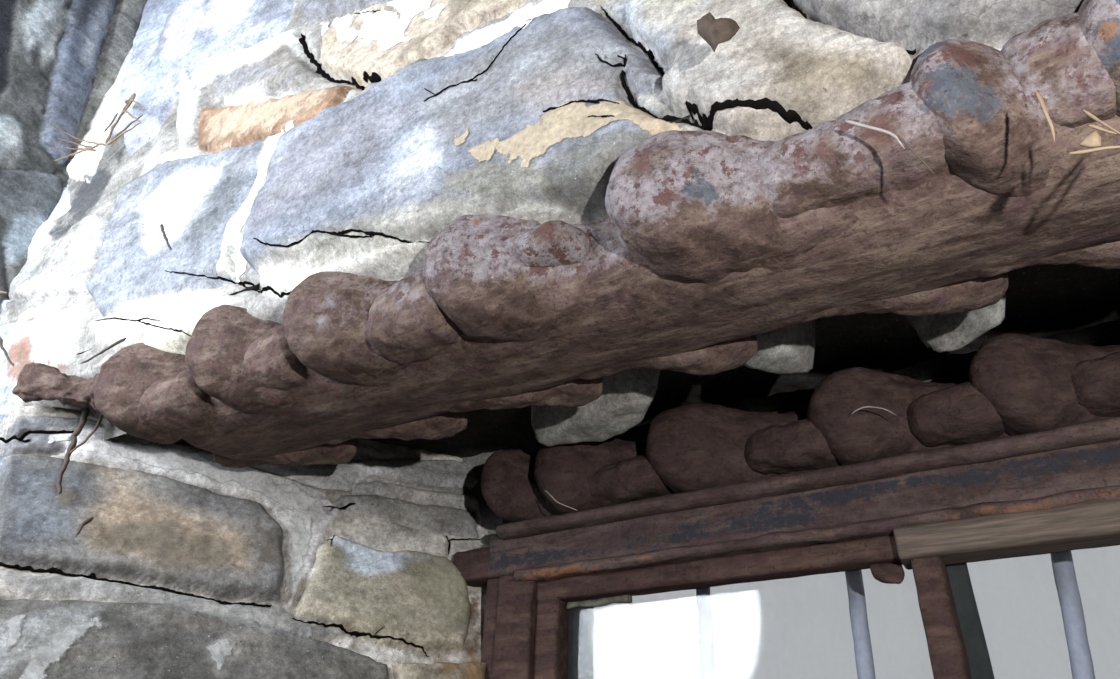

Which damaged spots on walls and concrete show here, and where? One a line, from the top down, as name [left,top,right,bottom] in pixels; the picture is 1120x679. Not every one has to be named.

crack [783,0,808,19]
crack [299,33,381,90]
crack [424,24,526,102]
crack [543,5,813,131]
spalling [453,99,687,168]
crack [253,229,429,247]
crack [164,270,290,298]
corrosion [870,563,905,584]
crack [0,562,429,657]